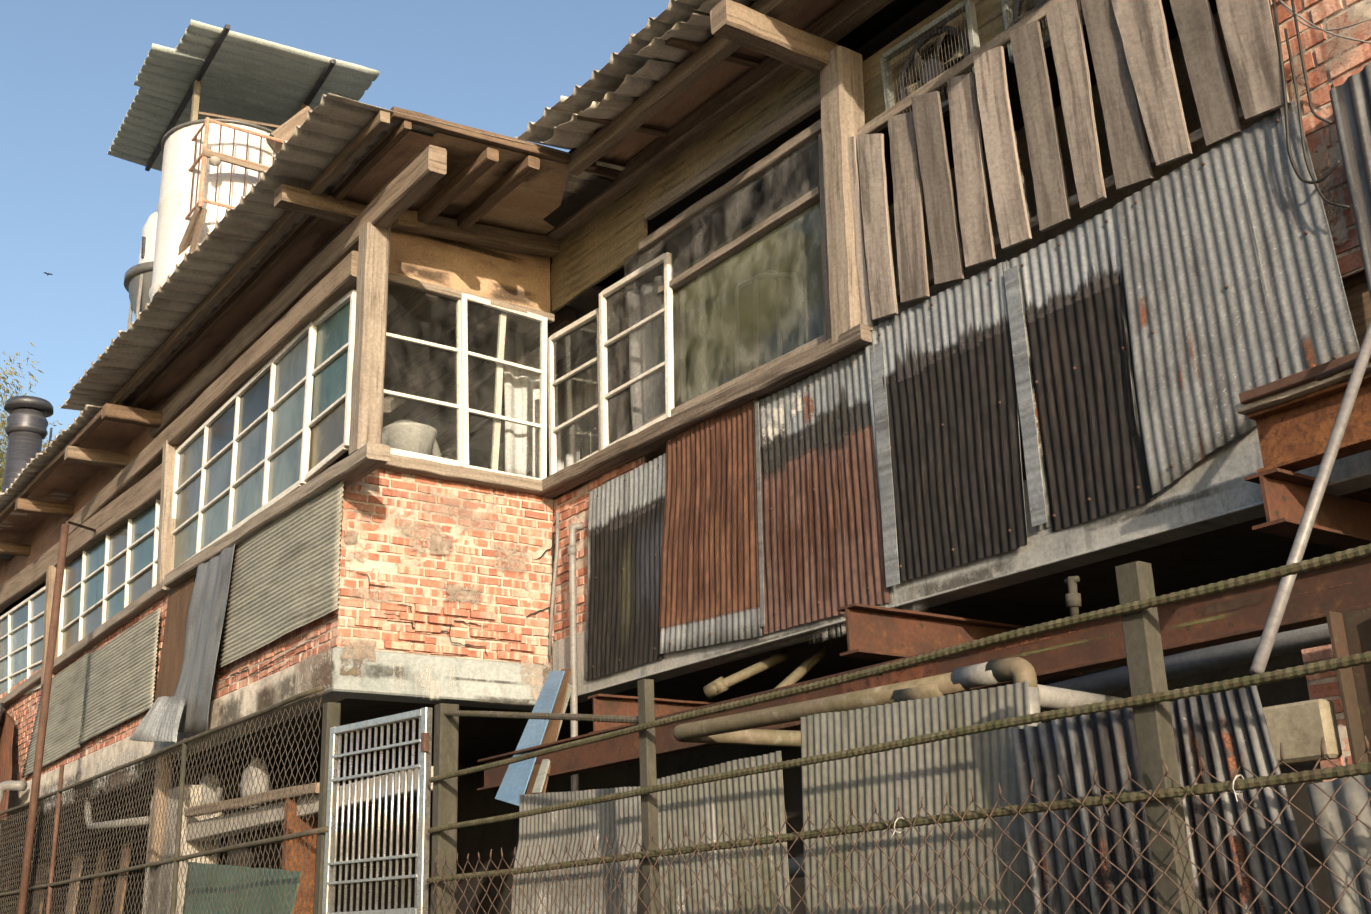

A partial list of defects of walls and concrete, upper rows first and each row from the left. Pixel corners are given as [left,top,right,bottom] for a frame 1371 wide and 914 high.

corrosion [1302,337,1317,369]
corrosion [659,398,890,636]
corrosion [839,660,937,694]
corrosion [1220,723,1238,770]
corrosion [1231,837,1264,914]